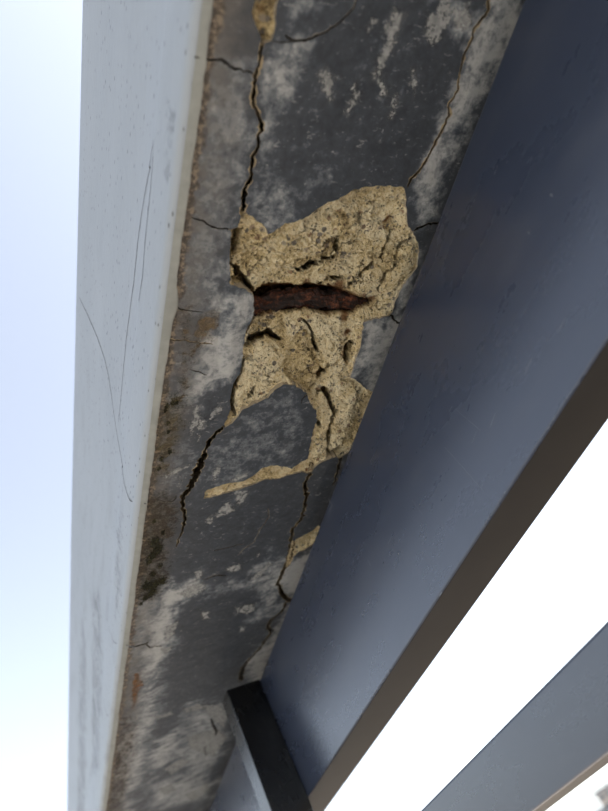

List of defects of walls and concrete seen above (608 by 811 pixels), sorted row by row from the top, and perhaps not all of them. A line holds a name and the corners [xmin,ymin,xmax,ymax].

spalling [252,0,278,46]
crack [191,0,356,230]
crack [407,0,490,188]
crack [80,145,224,546]
spalling [189,185,419,524]
crack [238,462,314,682]